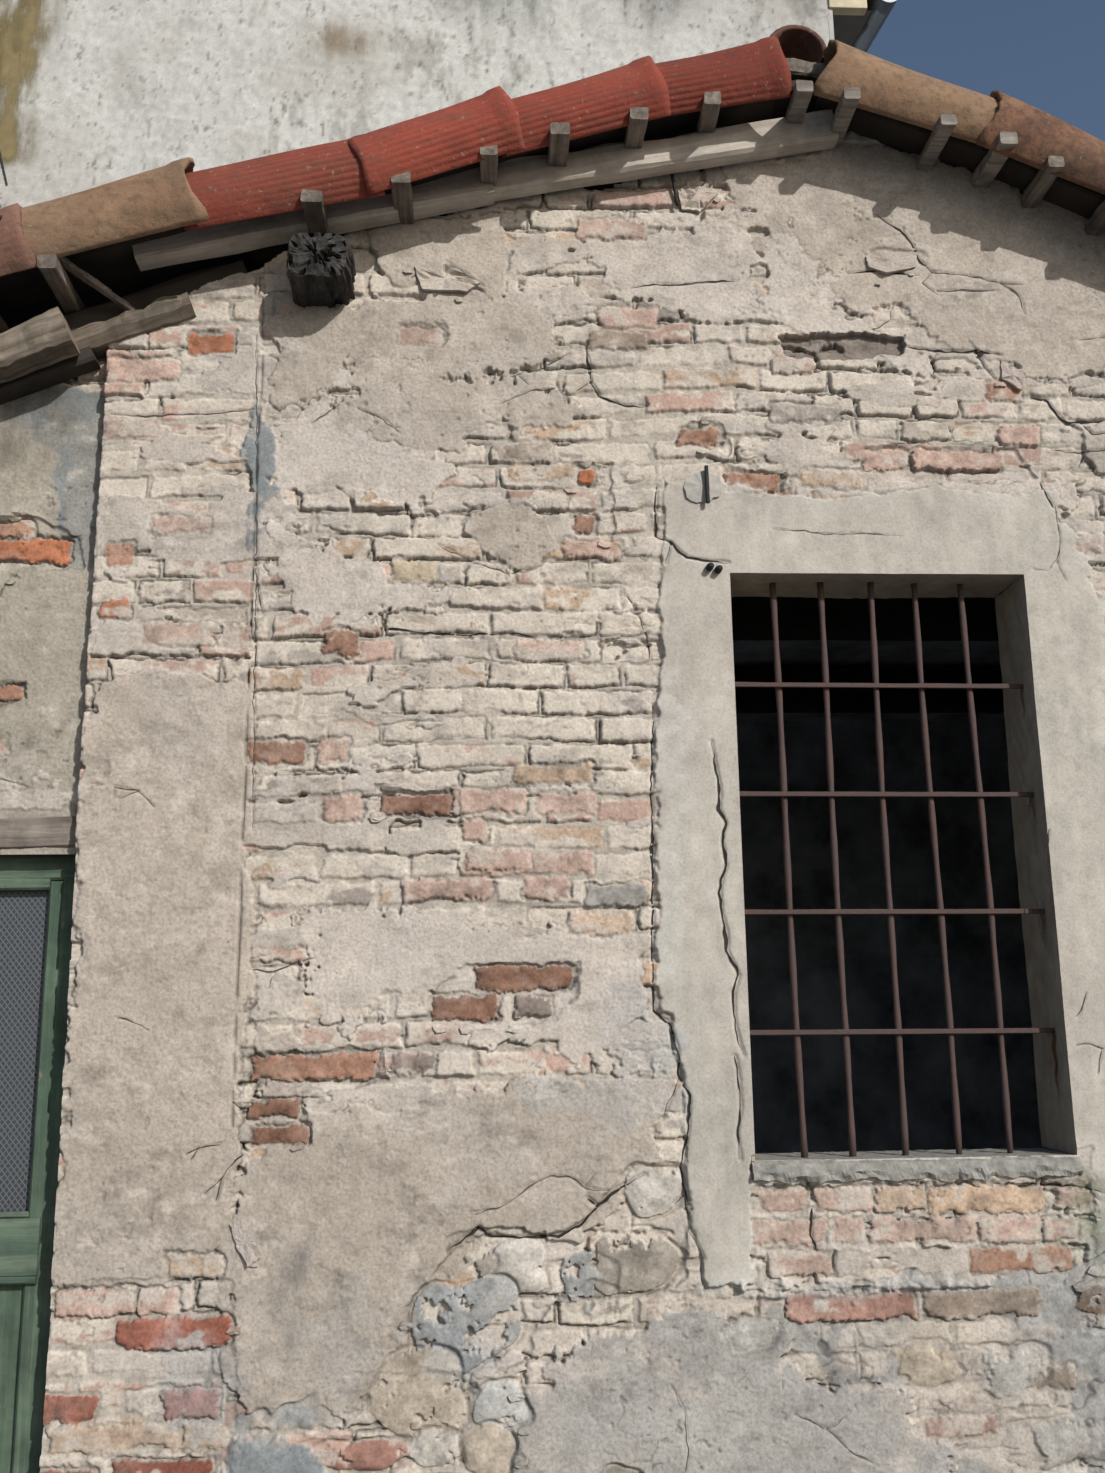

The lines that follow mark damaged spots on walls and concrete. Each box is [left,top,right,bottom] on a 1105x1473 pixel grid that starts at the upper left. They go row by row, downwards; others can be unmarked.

water stain [0,0,48,163]
crack [856,214,1025,313]
spalling [778,331,906,363]
crack [654,487,728,564]
spalling [427,960,582,1034]
crack [650,707,704,1259]
crack [712,748,743,1157]
spalling [234,1044,391,1151]
spalling [39,1218,261,1473]
spalling [296,1160,691,1473]
crack [451,1175,643,1248]
spalling [754,1177,1105,1338]